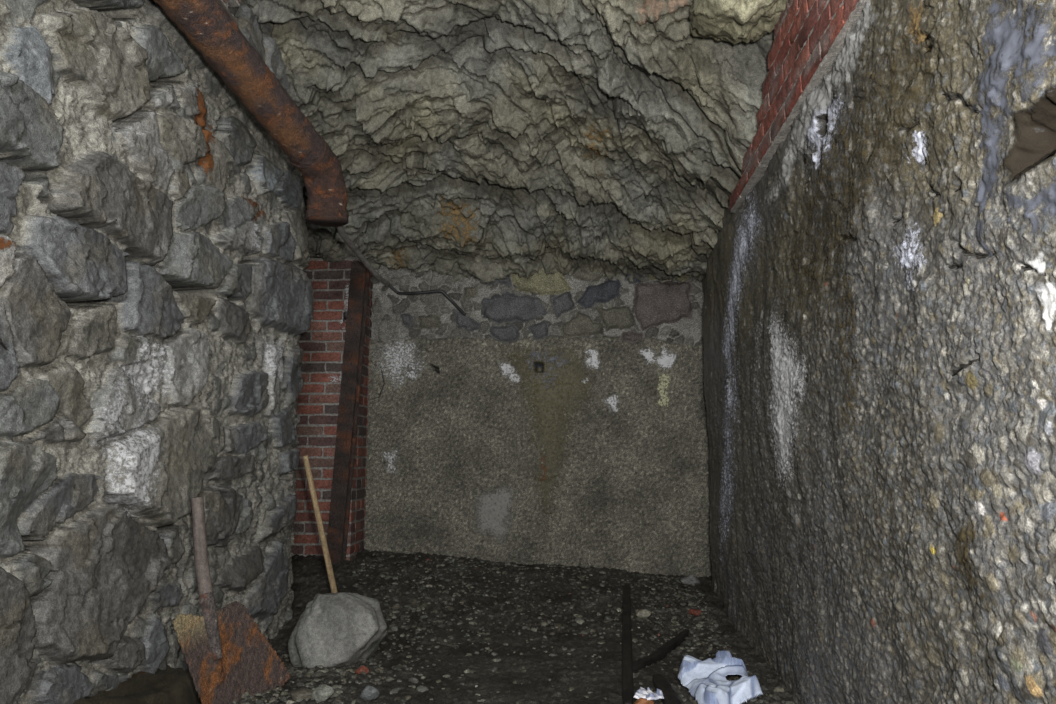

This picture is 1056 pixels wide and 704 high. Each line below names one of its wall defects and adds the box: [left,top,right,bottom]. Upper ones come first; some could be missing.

rust [194,88,218,178]
water stain [752,2,940,496]
water stain [500,344,600,522]
water stain [640,347,676,407]
water stain [718,186,765,572]